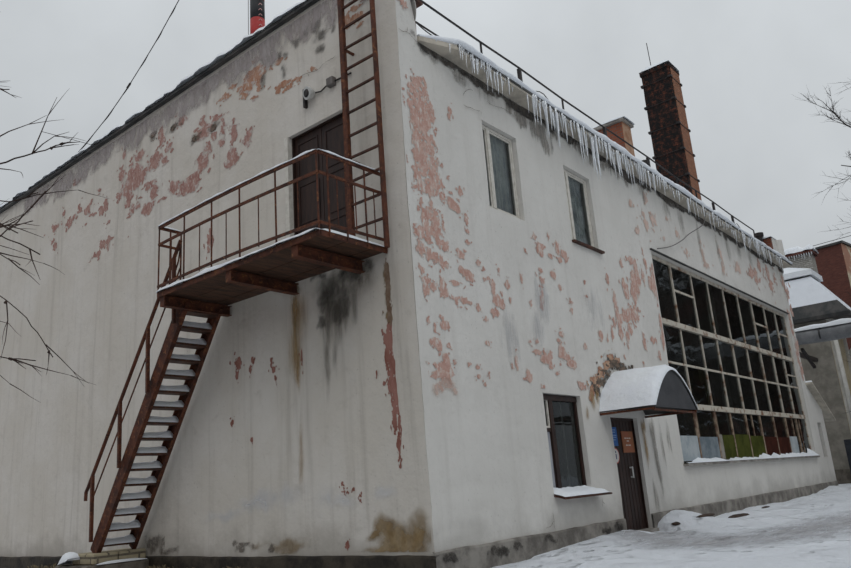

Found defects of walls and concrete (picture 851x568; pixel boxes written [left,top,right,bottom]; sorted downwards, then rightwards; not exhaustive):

peeling [44,57,302,254]
peeling [402,68,512,322]
peeling [88,235,114,263]
peeling [229,352,255,380]
peeling [376,258,404,469]
peeling [426,314,457,395]
peeling [524,232,573,315]
peeling [528,328,577,376]
peeling [577,249,665,403]
peeling [716,242,804,381]
leakage [369,517,426,552]